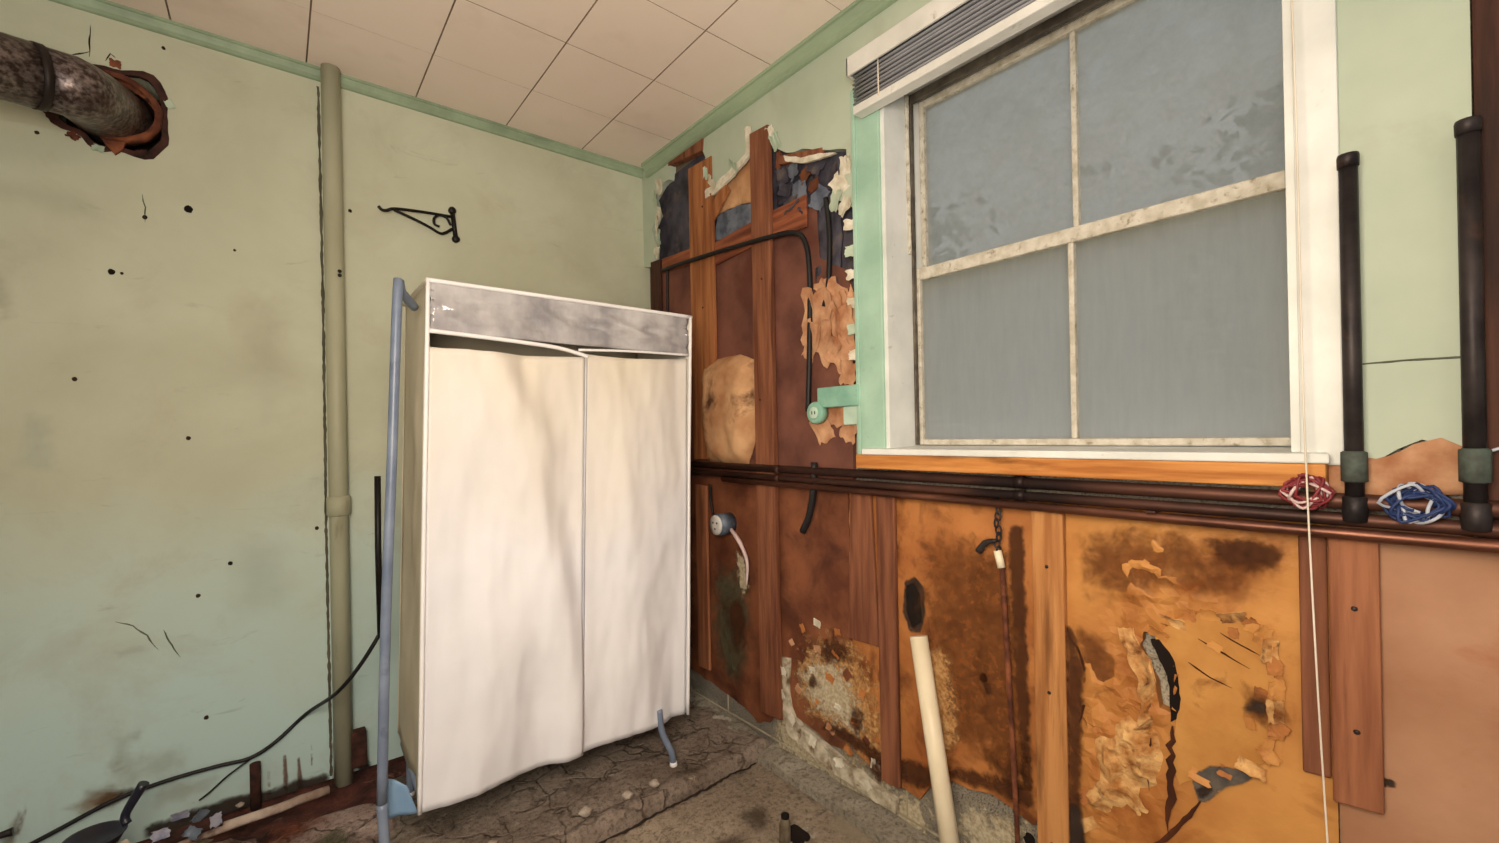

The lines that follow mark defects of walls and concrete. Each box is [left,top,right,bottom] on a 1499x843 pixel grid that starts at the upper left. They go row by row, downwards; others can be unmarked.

flaking render [652,178,663,259]
flaking render [703,124,856,360]
peeling [780,618,900,814]
leakage [776,720,933,835]
leakage [906,526,1033,843]
peeling [1079,699,1163,833]